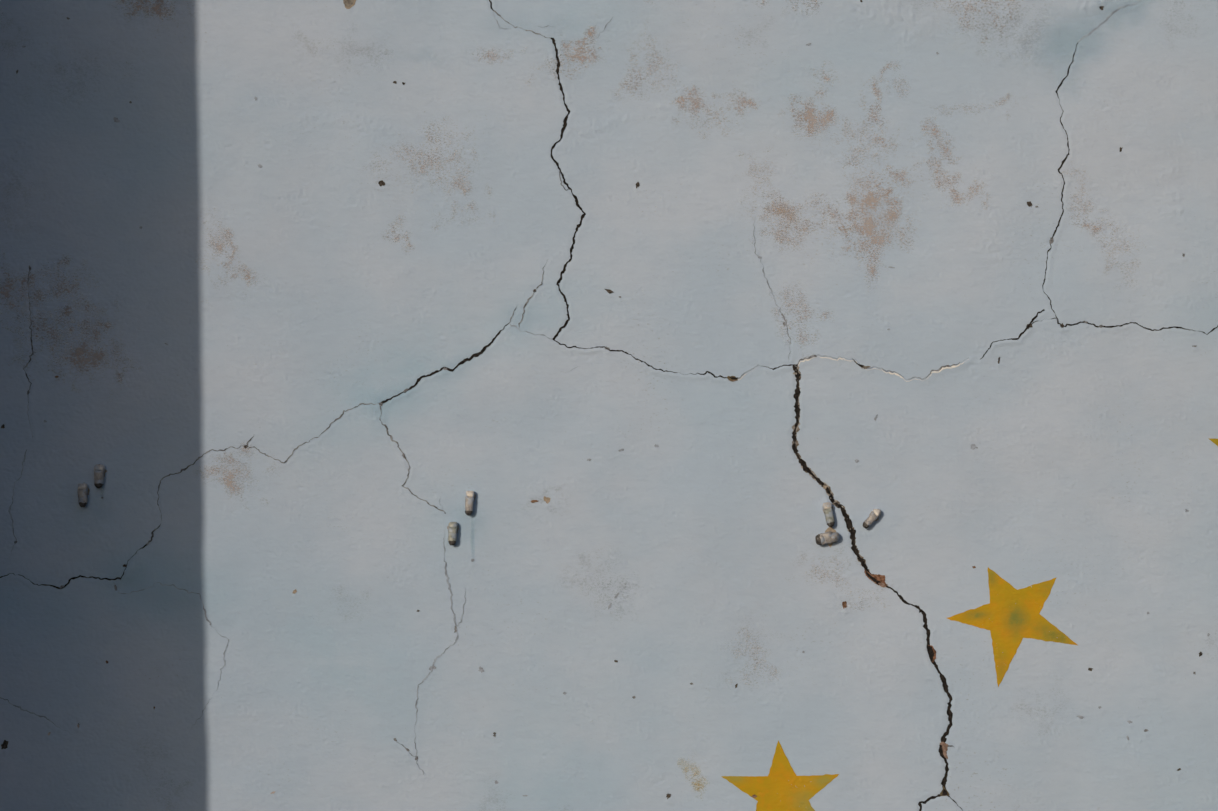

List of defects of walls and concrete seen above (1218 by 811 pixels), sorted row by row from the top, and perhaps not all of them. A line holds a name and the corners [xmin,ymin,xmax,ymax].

crack [0,0,969,811]
crack [981,0,1218,359]